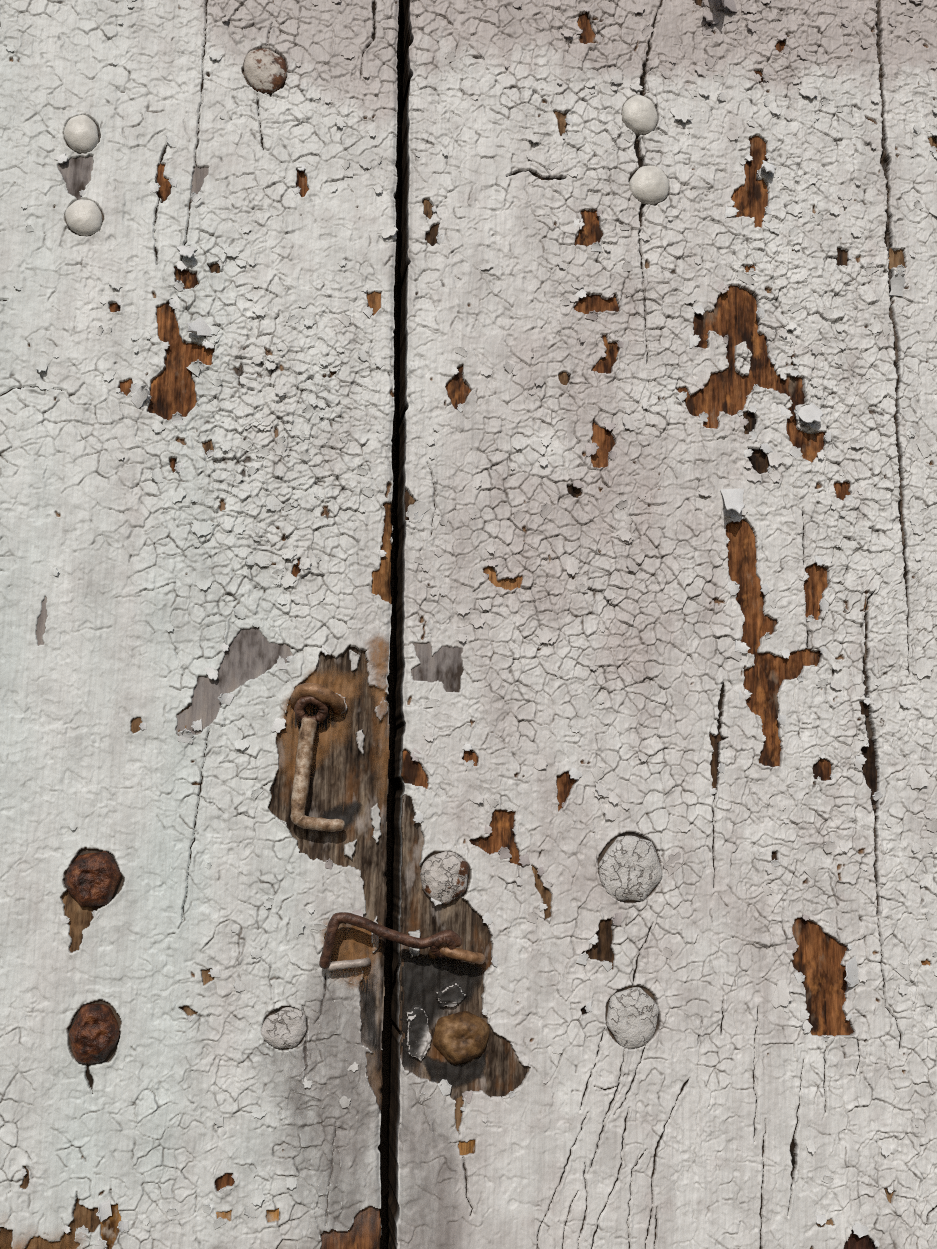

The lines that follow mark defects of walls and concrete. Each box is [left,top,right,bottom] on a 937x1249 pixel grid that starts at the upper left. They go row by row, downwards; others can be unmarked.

crack [154,0,208,264]
peeling [118,246,226,427]
peeling [675,282,831,474]
crack [875,2,910,674]
rust [283,673,355,777]
rust [371,639,389,794]
peeling [720,489,829,767]
rust [324,926,377,985]
peeling [268,642,530,1155]
peeling [787,914,859,1041]
crack [537,1028,689,1249]
crack [753,1007,826,1249]